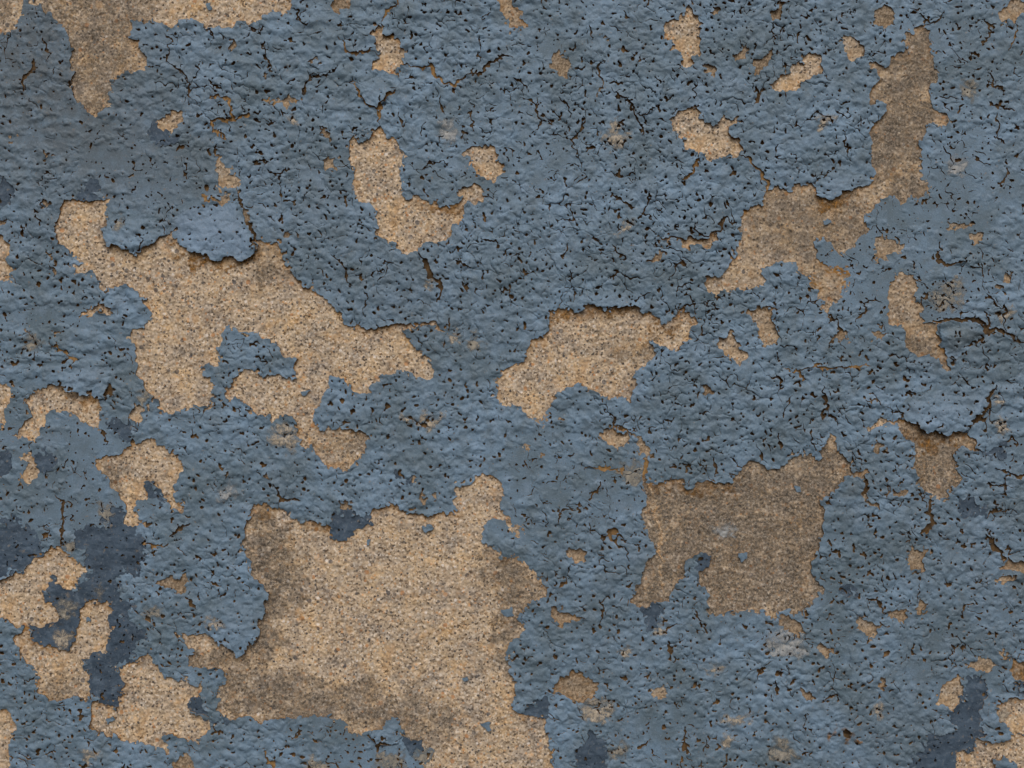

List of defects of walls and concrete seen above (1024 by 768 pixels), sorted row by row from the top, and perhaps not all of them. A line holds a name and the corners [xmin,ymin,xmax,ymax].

peeling [0,0,296,118]
crack [416,8,586,158]
crack [589,26,654,135]
peeling [319,122,506,255]
peeling [704,22,955,319]
peeling [37,154,449,472]
crack [418,253,471,330]
peeling [491,288,702,428]
crack [783,306,869,451]
crack [921,292,1023,347]
crack [964,386,997,428]
peeling [0,472,587,768]